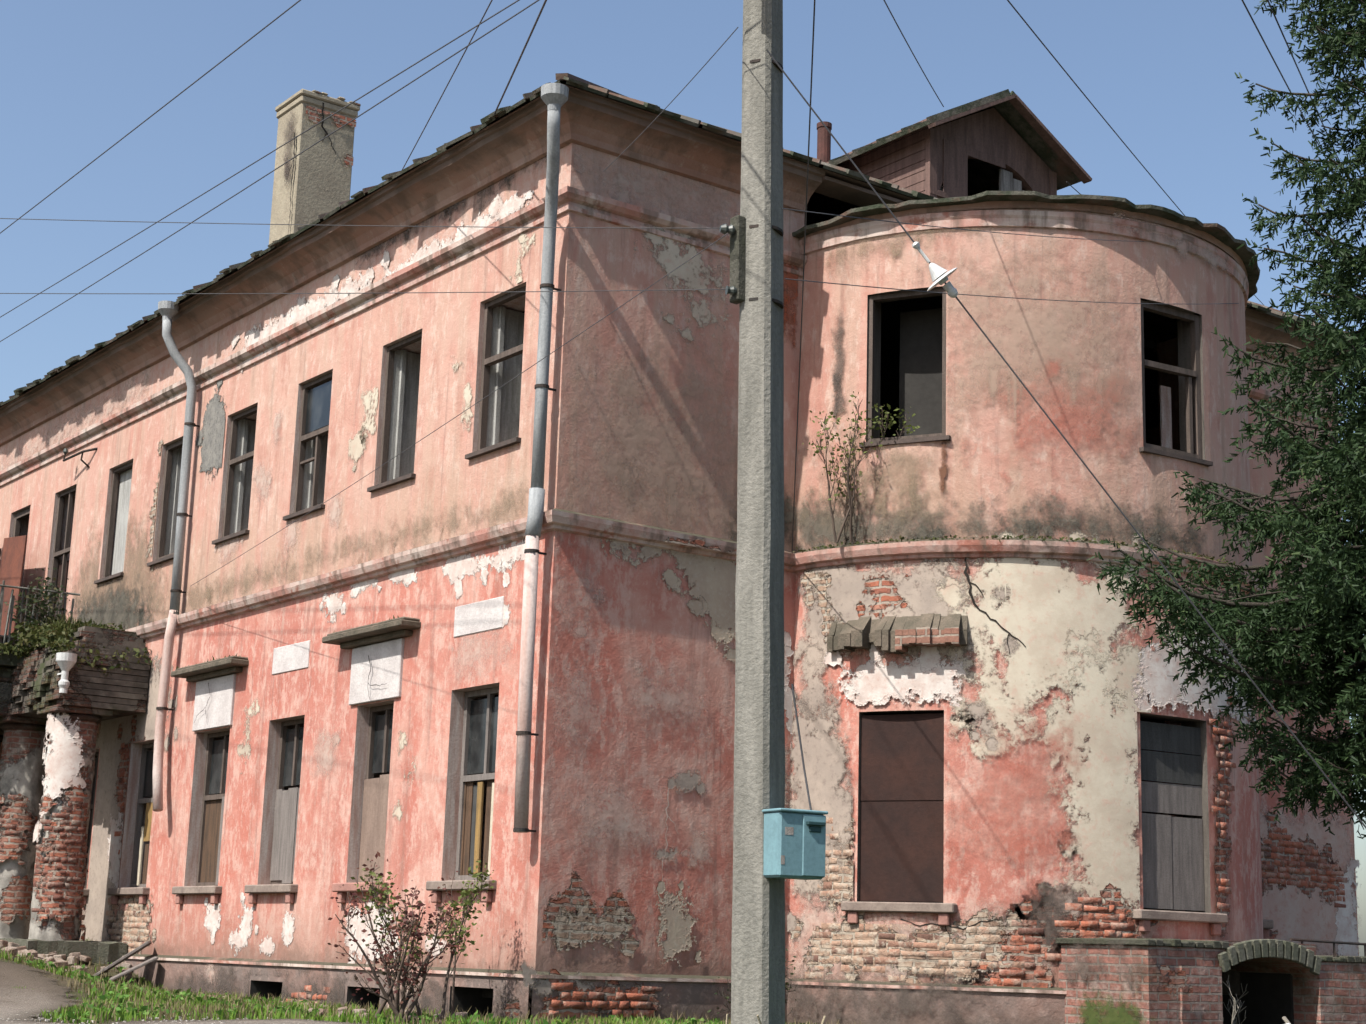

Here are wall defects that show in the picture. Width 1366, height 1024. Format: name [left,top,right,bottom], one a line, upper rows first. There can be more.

peeling [231,189,535,373]
peeling [634,226,728,341]
spalling [195,379,227,478]
peeling [348,388,378,471]
peeling [452,361,473,431]
damp [784,454,1205,554]
peeling [600,537,737,664]
crack [964,557,1026,655]
peeling [784,558,1257,988]
peeling [204,893,295,957]
spalling [542,832,710,966]
spalling [504,960,669,1022]